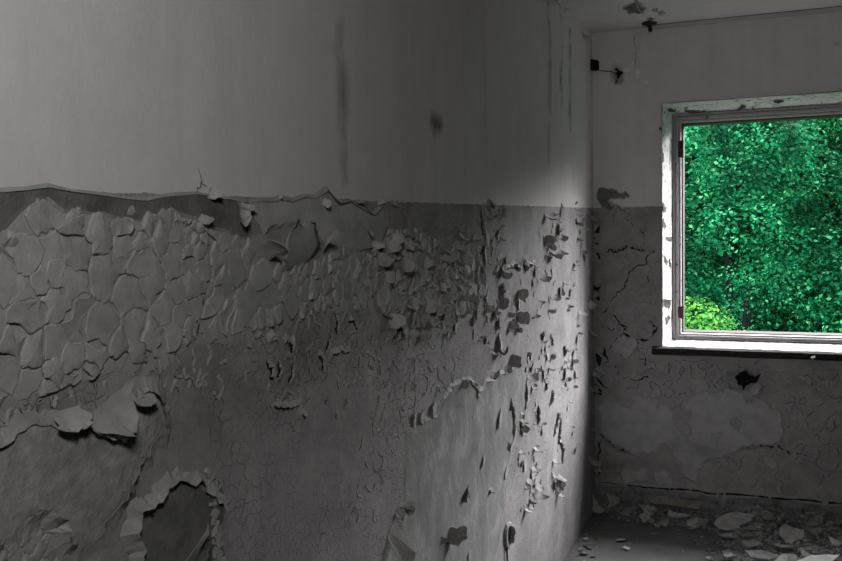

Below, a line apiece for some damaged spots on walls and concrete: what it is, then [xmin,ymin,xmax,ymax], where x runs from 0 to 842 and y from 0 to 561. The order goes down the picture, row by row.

peeling [622,1,666,16]
crack [602,228,655,315]
peeling [0,183,630,561]
flaking render [589,315,786,484]